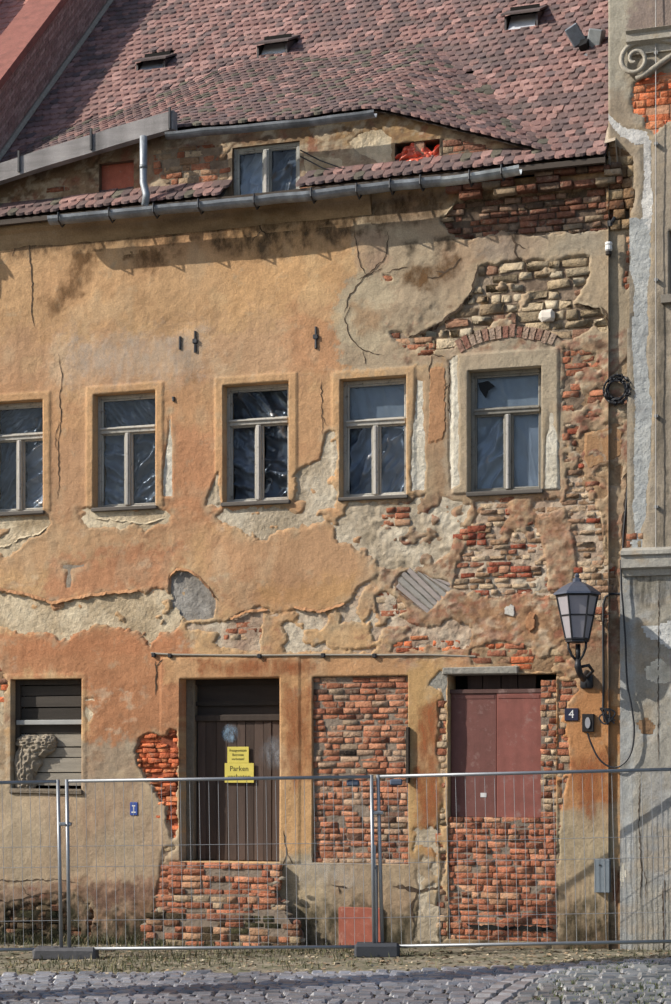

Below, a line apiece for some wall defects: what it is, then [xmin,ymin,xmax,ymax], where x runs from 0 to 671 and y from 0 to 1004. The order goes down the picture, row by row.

flaking render [441,139,492,156]
water stain [51,240,113,312]
crack [344,231,405,364]
crack [409,258,548,422]
flaking render [440,145,635,290]
crack [55,358,63,494]
flaking render [0,257,643,809]
peeling [641,621,671,649]
peeling [644,659,671,683]
flaking render [135,729,179,912]